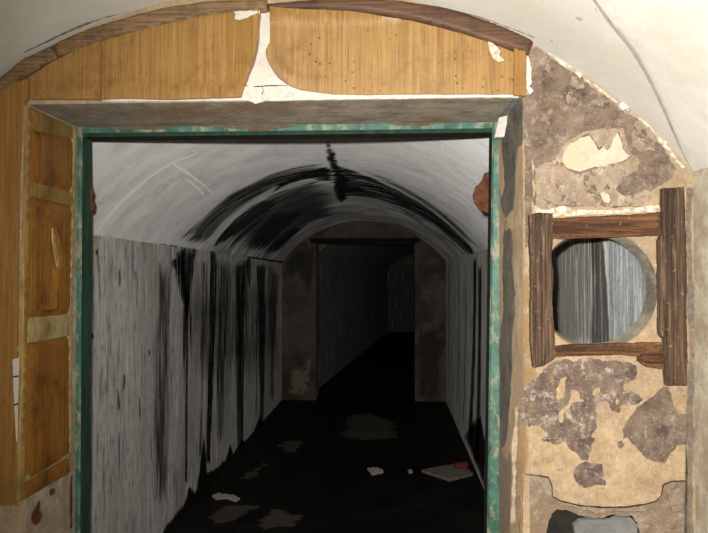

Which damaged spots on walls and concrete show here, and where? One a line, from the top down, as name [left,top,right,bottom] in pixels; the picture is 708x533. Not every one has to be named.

peeling [102,0,708,248]
damp [149,145,485,531]
peeling [499,228,689,533]